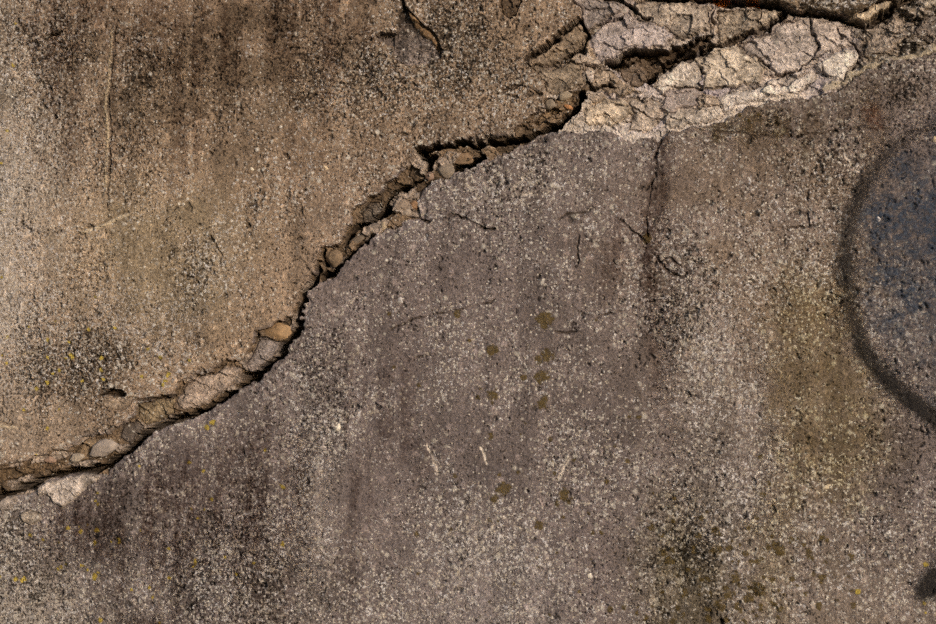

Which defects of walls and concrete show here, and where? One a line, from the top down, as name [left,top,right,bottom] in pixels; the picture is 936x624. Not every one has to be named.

crack [103,23,121,211]
spalling [499,0,936,144]
crack [697,126,935,138]
crack [555,140,710,279]
crack [759,173,825,232]
crack [0,55,591,525]
crack [553,310,622,334]